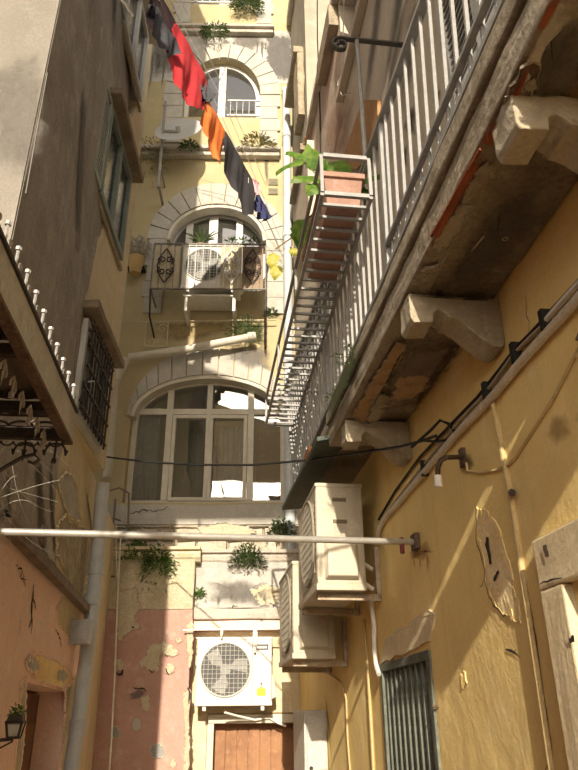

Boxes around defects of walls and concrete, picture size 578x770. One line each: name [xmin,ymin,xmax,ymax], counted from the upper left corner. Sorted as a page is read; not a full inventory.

corrosion [430,122,497,246]
spalling [353,342,430,424]
water stain [217,582,266,603]
flaking render [249,583,280,606]
flaking render [477,507,522,624]
flaking render [138,619,194,675]
flaking render [14,650,77,770]
flaking render [150,689,191,770]